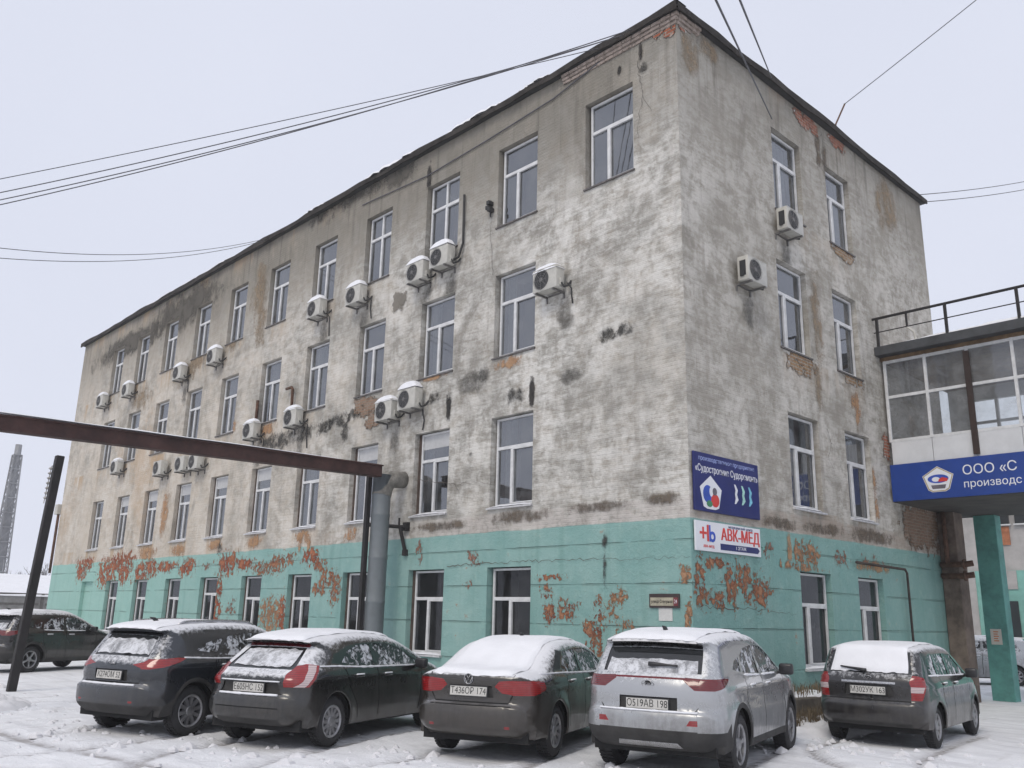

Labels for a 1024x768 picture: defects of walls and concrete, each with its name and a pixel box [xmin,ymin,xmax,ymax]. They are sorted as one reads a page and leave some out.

flaking render [792,107,846,154]
water stain [600,324,632,343]
flaking render [784,352,819,380]
water stain [259,409,360,453]
flaking render [354,396,378,431]
peeling [72,549,196,590]
peeling [213,546,342,632]
peeling [677,551,777,627]
peeling [780,538,830,573]
peeling [537,573,637,658]